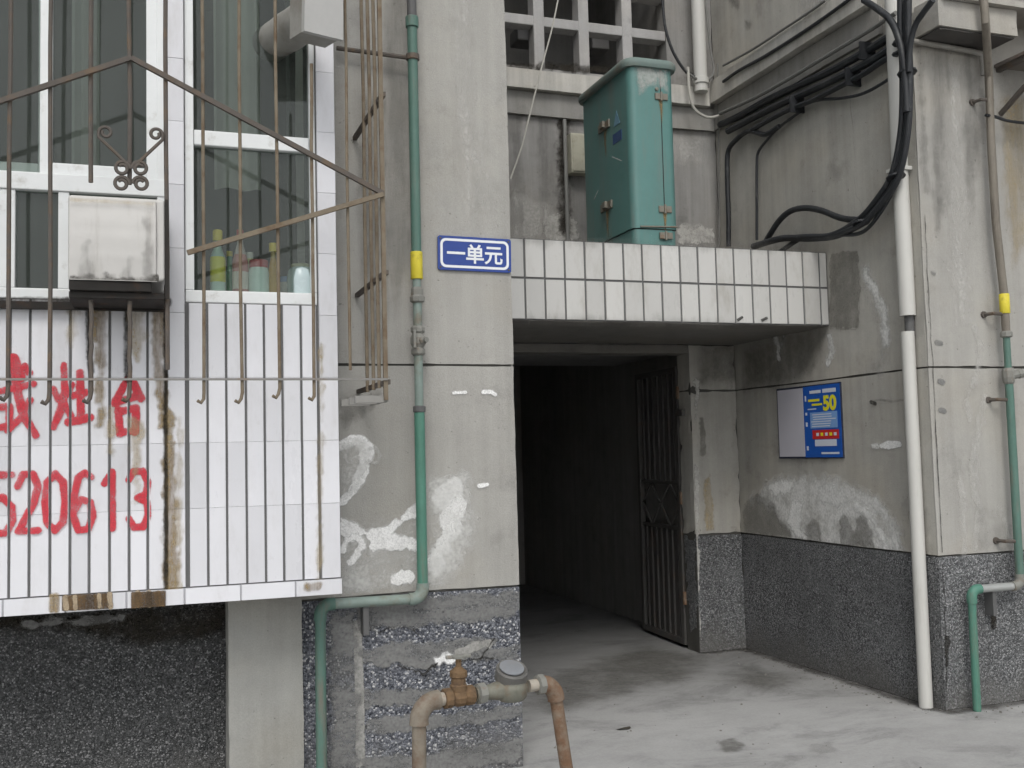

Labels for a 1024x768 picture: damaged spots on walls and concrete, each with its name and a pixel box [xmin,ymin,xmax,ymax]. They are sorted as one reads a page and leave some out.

corrosion [153,312,180,590]
efflorescence [339,435,471,591]
efflorescence [752,476,900,551]
corrosion [49,593,59,612]